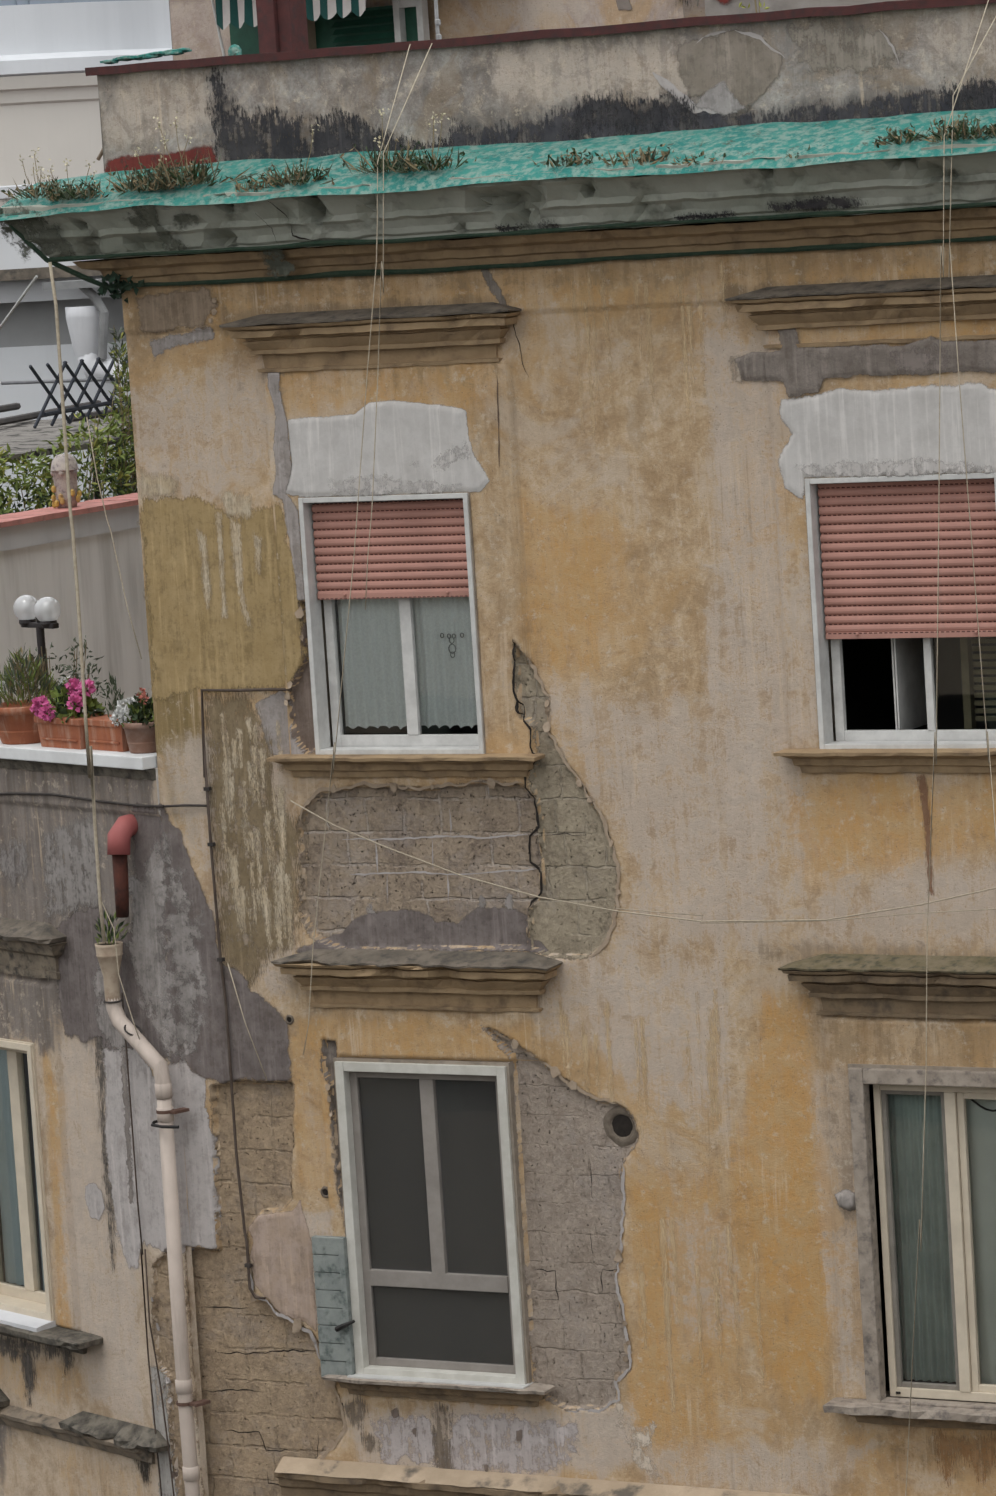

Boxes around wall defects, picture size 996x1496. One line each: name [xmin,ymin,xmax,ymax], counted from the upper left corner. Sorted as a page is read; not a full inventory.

leakage [205,67,996,161]
spalling [653,16,904,115]
flaking render [137,467,621,989]
flaking render [151,1080,347,1496]
spalling [372,1027,639,1475]